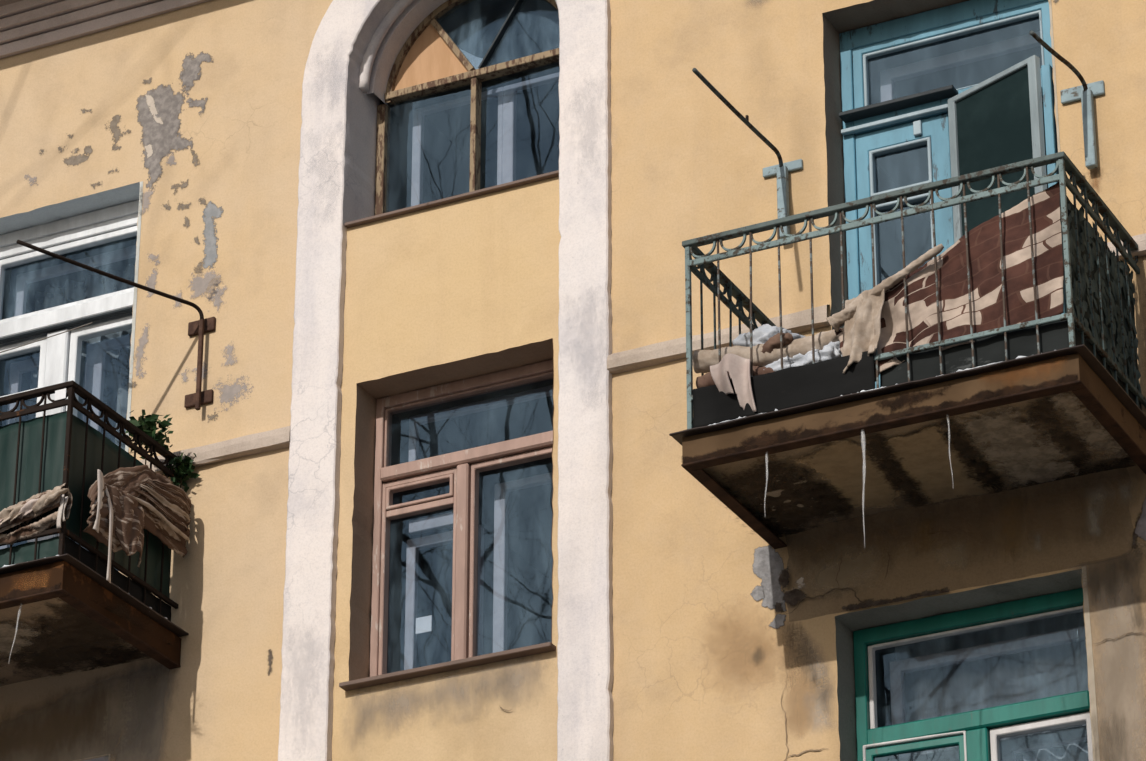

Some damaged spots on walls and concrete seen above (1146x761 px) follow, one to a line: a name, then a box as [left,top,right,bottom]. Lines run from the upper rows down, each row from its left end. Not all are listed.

peeling [58,134,92,166]
peeling [106,51,227,310]
peeling [128,326,148,387]
peeling [182,363,252,422]
corrosion [682,365,1078,464]
spalling [723,393,1134,629]
leakage [0,599,169,761]
crack [781,669,829,761]
leakage [1090,555,1146,761]